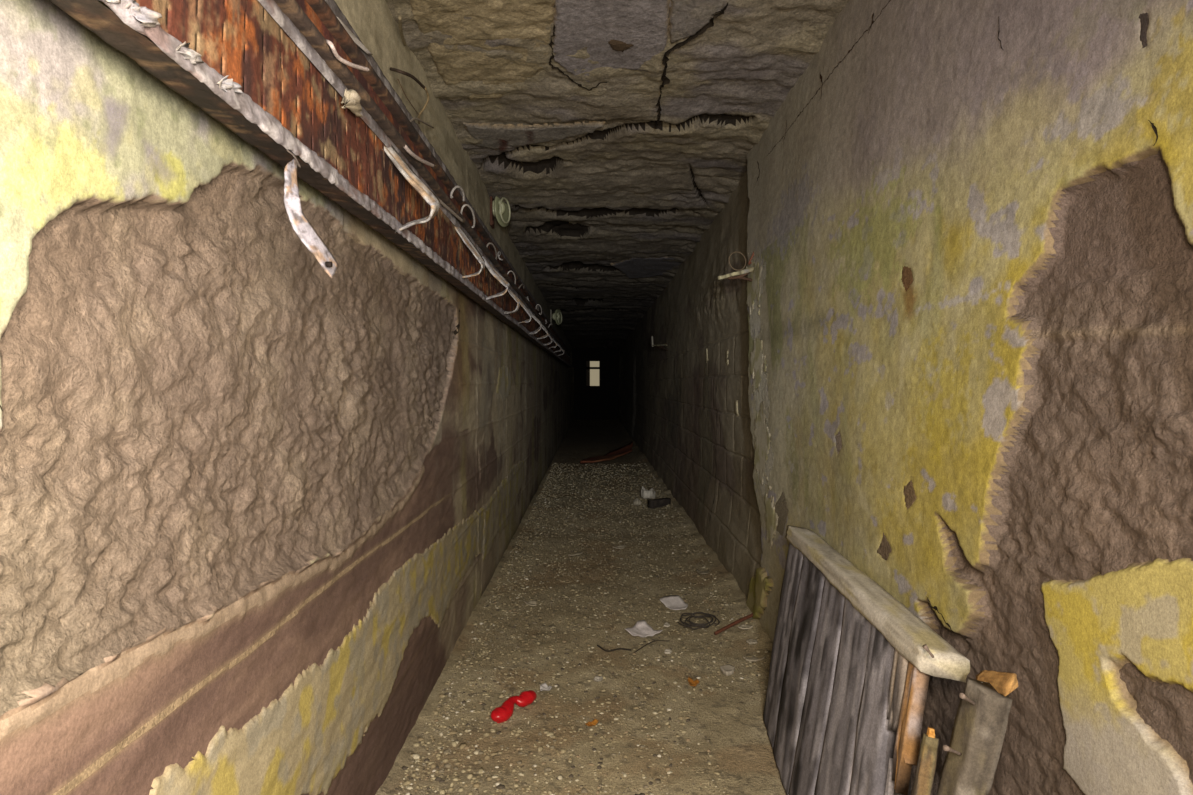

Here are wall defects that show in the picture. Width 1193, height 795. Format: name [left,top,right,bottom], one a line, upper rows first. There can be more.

crack [483,3,753,175]
crack [756,0,891,183]
crack [512,168,706,312]
leakage [747,251,766,339]
peeling [901,266,913,292]
spalling [0,164,490,795]
peeling [904,480,917,510]
spalling [919,151,1193,795]